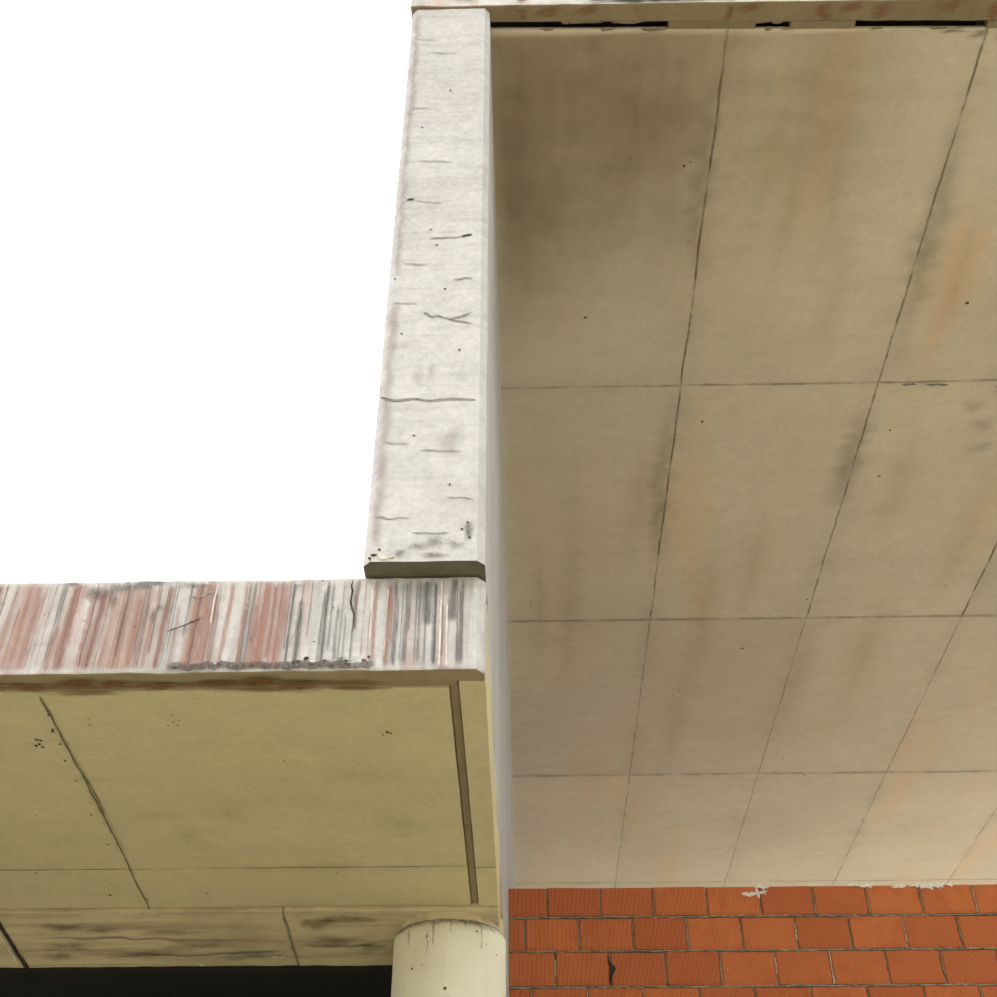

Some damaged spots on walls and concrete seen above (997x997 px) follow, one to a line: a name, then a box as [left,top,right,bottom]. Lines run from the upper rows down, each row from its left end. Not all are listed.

crack [396,302,471,323]
crack [381,395,475,403]
crack [382,442,460,451]
crack [375,516,450,534]
rust [0,586,81,668]
rust [75,585,234,667]
rust [235,583,292,664]
crack [348,581,356,631]
rust [0,678,379,695]
crack [39,697,150,909]
crack [0,924,28,968]
crack [45,913,386,965]